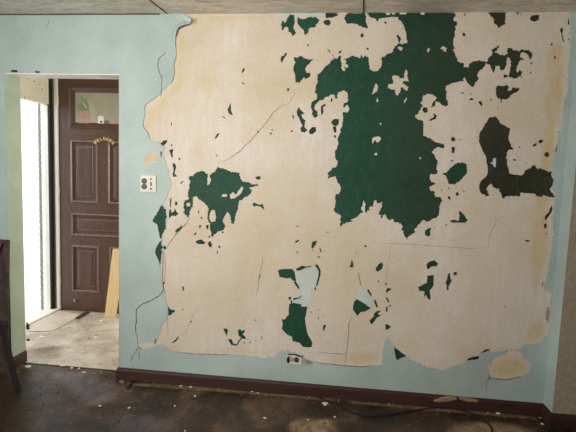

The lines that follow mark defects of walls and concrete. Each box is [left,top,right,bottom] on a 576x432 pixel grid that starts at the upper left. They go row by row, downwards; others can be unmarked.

water stain [538,30,566,172]
crack [131,221,188,360]
peeling [138,12,572,370]
water stain [529,187,553,302]
water stain [489,354,530,379]